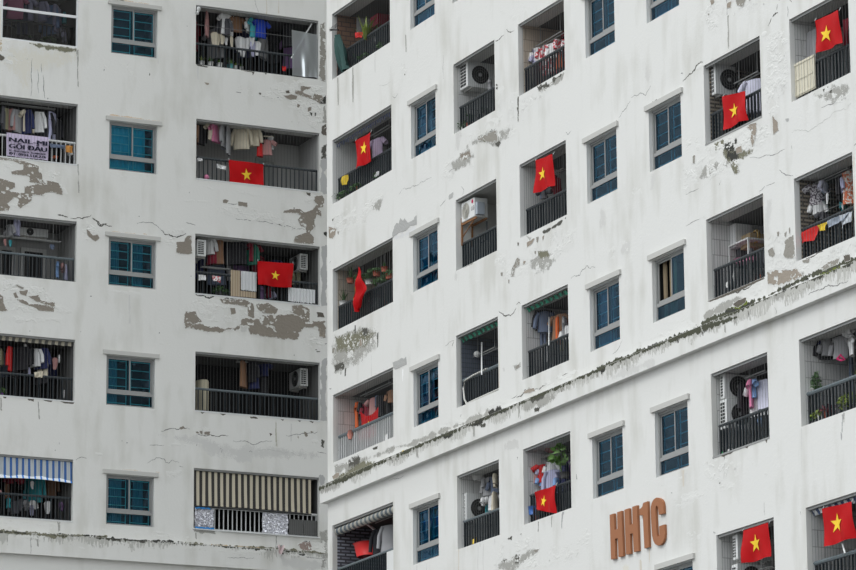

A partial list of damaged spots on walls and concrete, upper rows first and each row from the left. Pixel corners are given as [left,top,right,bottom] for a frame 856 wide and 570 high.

peeling [236,23,327,135]
peeling [683,26,790,186]
spalling [0,157,68,214]
crack [58,214,112,227]
damp [530,250,556,273]
peeling [0,277,73,315]
spalling [180,296,377,374]
damp [319,261,856,494]
crack [154,428,326,467]
damp [0,522,216,552]